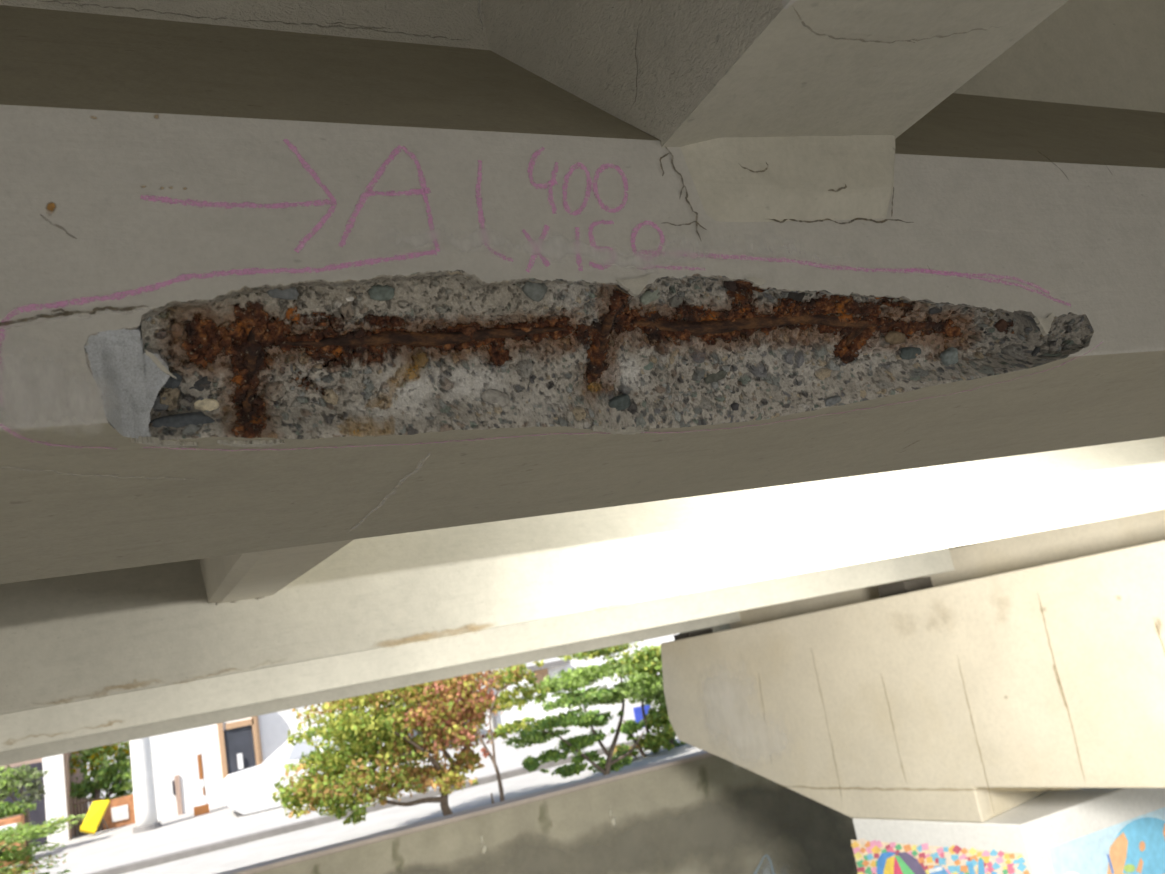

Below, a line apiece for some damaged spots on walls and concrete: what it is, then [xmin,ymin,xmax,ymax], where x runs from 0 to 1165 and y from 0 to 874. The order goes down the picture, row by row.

crack [660,140,707,240]
crack [771,184,914,224]
crack [0,305,149,326]
spalling [84,270,1094,448]